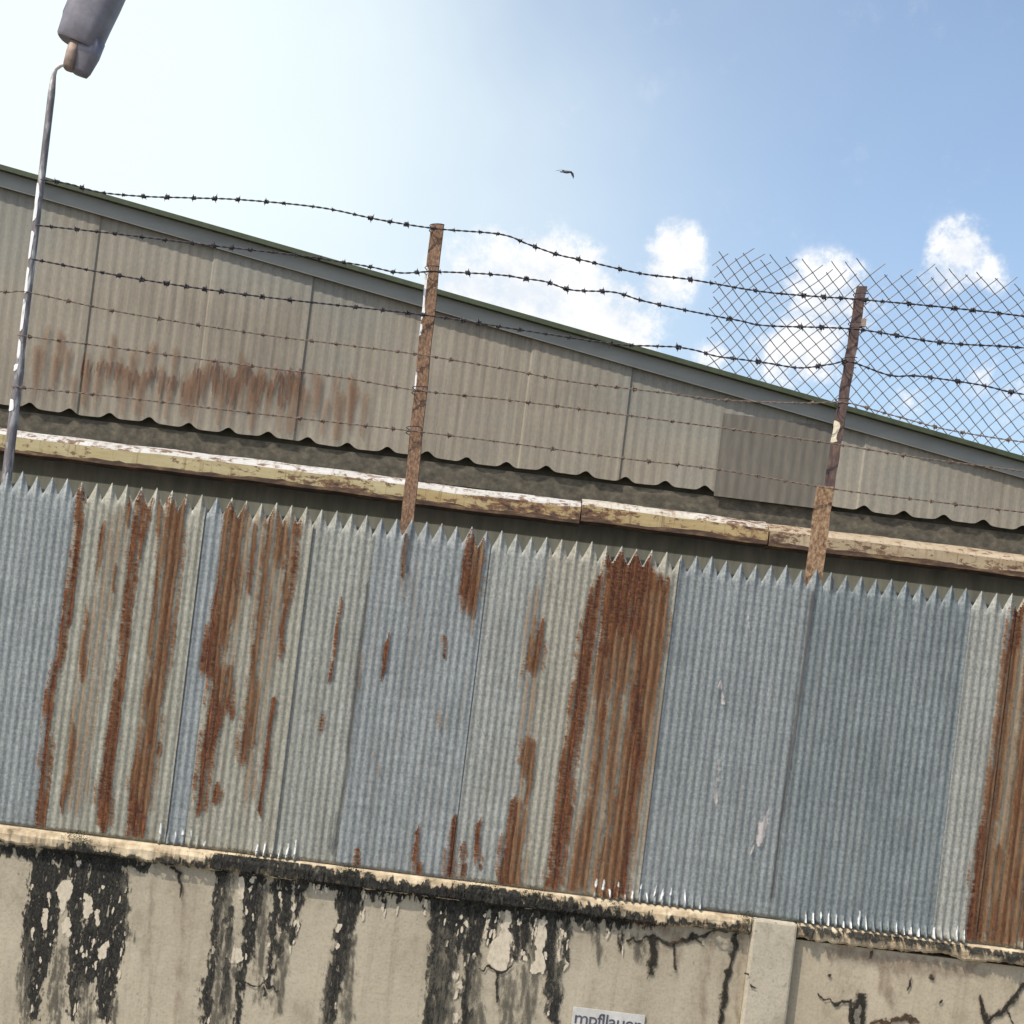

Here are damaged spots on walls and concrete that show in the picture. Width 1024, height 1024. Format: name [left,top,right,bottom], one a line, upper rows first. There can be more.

rust [34,484,189,839]
rust [192,501,302,818]
leakage [0,841,751,1024]
rust [411,824,424,875]
rust [458,529,486,635]
rust [442,586,547,886]
rust [542,549,672,900]
crack [626,920,756,1024]
crack [817,993,853,1007]
rust [966,601,1024,946]
crack [979,982,1024,1024]